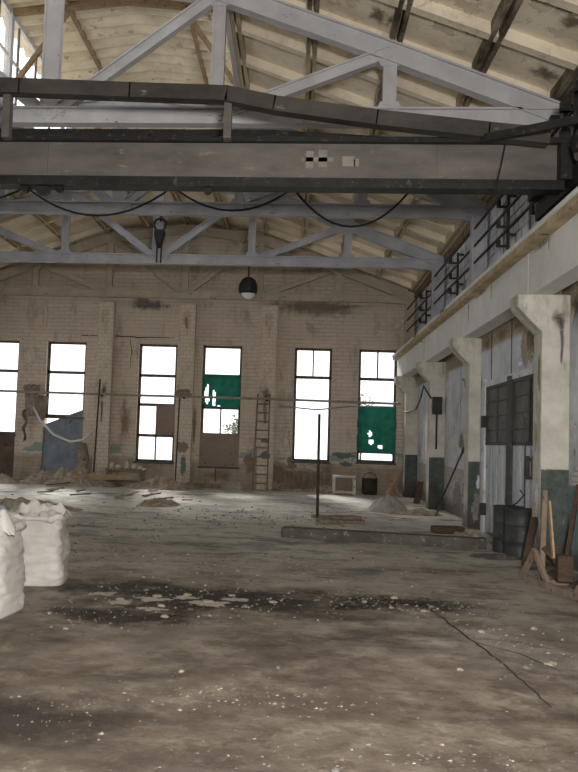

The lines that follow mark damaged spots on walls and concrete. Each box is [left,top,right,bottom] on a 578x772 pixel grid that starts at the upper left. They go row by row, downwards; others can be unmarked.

damp [537,68,557,80]
peeling [519,330,540,388]